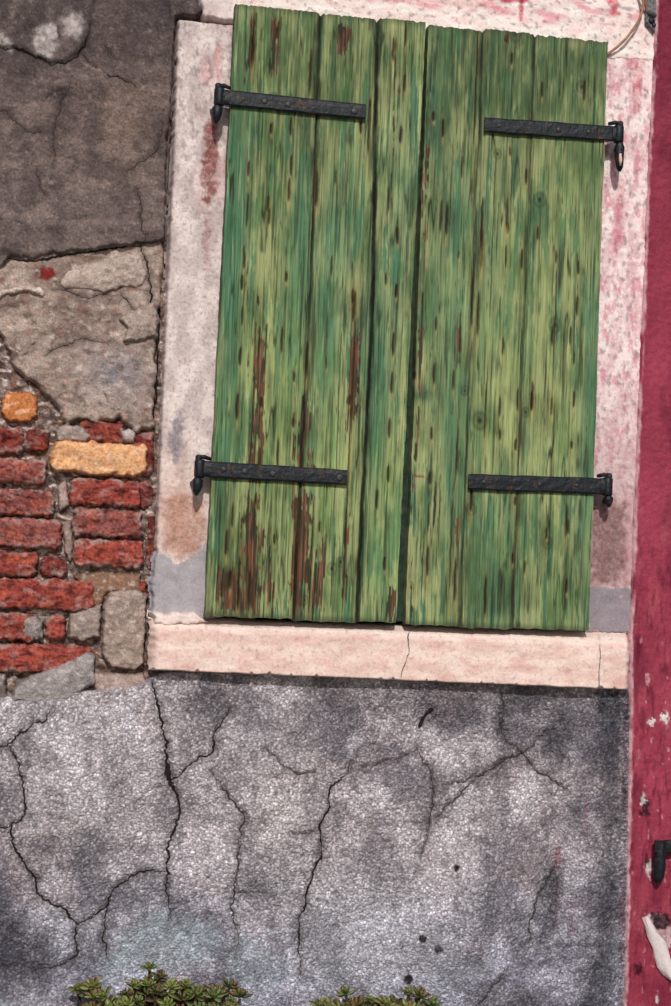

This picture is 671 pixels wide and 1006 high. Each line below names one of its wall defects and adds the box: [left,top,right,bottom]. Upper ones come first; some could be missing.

crack [0,23,137,194]
crack [9,127,163,418]
spalling [0,235,167,702]
crack [0,682,268,970]
crack [267,690,566,974]
peeling [639,794,650,816]
peeling [642,912,671,981]